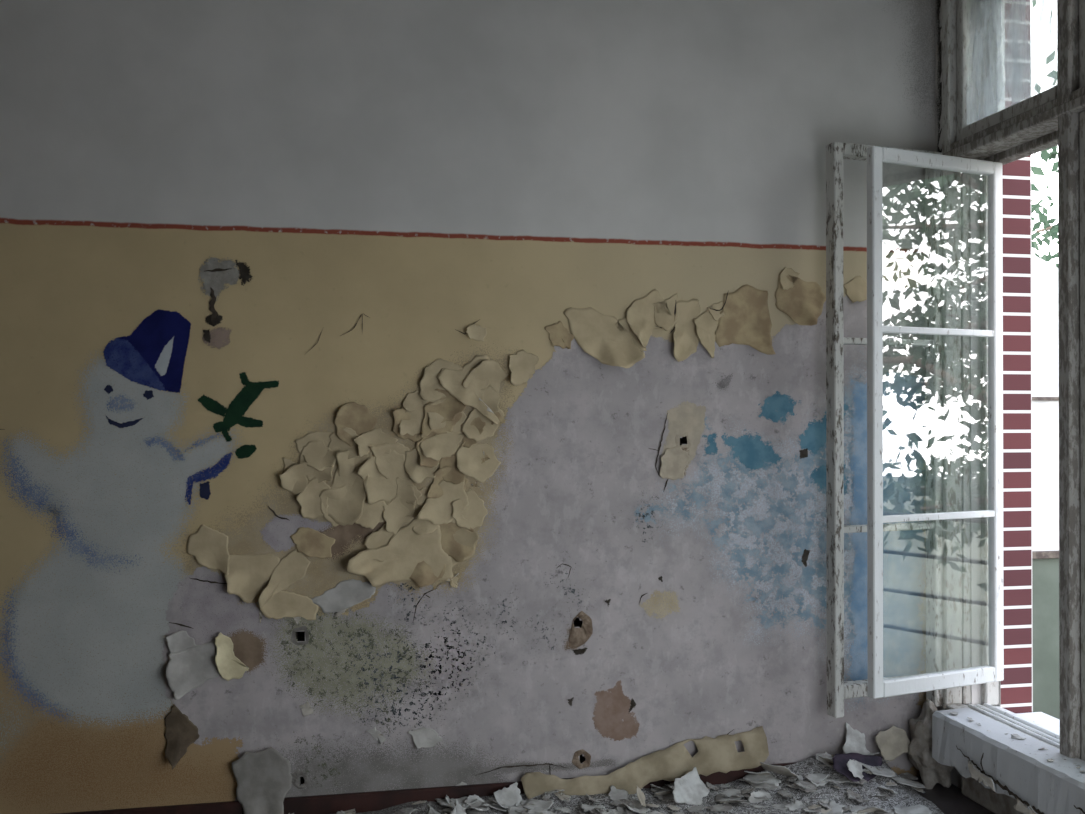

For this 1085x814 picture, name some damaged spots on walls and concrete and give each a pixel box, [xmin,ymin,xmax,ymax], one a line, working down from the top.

leakage [227,401,596,798]
peeling [162,256,954,814]
crack [956,746,1044,814]